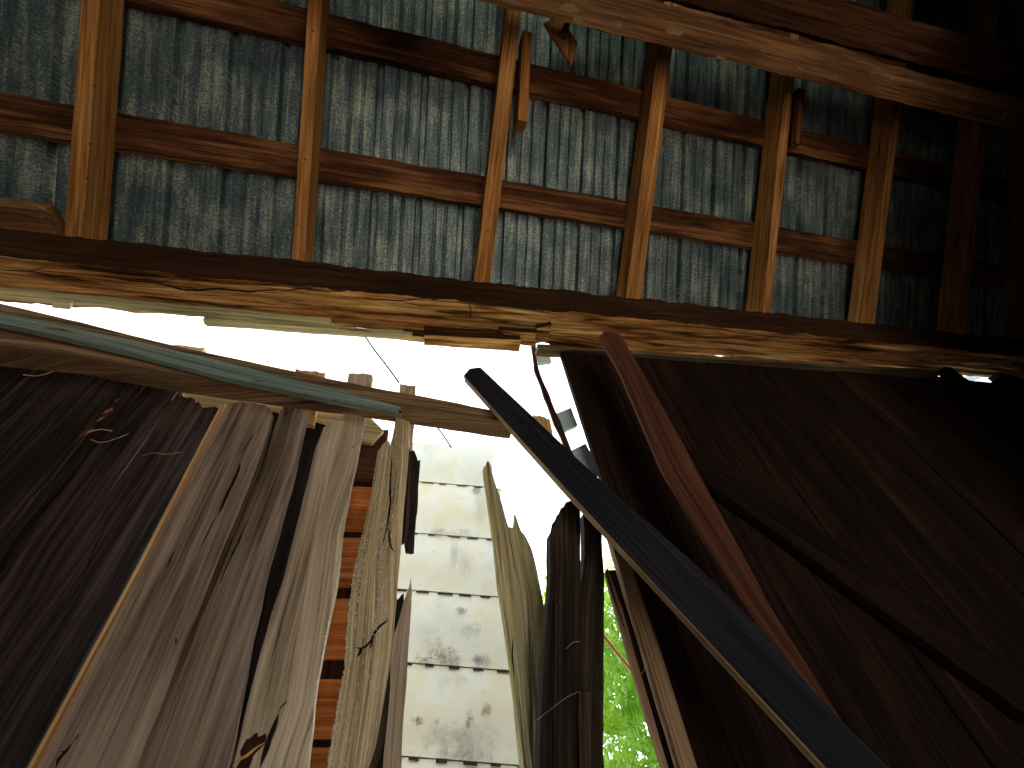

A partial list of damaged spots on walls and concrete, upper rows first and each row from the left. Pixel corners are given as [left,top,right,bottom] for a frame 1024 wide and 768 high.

crack [382,453,396,553]
crack [355,618,388,657]